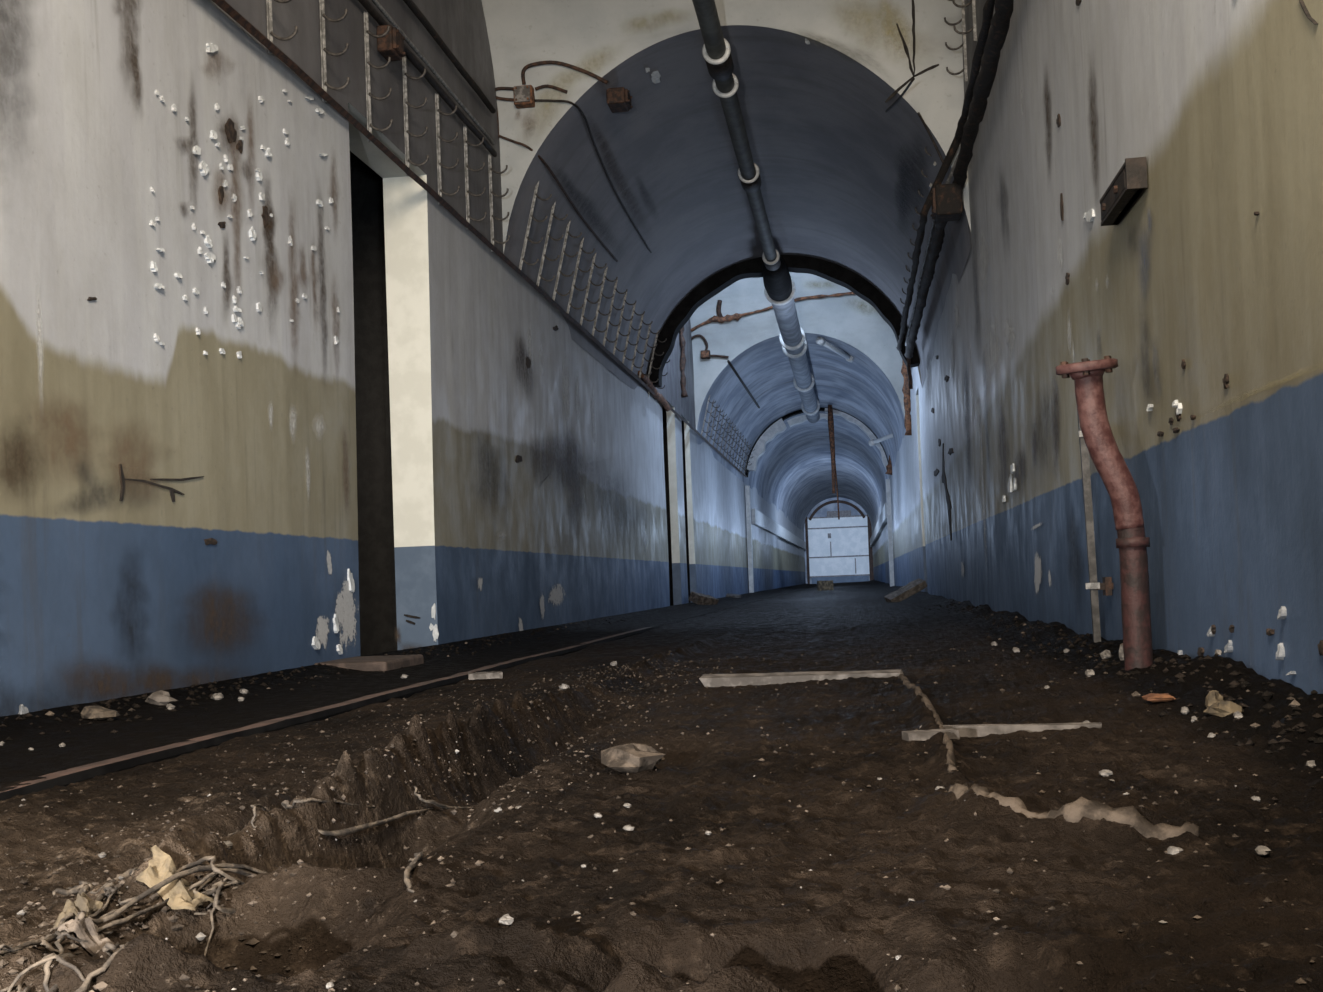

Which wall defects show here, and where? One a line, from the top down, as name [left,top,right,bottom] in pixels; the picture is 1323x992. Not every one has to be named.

damp [125,0,140,98]
peeling [190,103,290,263]
peeling [150,248,208,335]
peeling [221,282,262,329]
peeling [312,550,359,654]